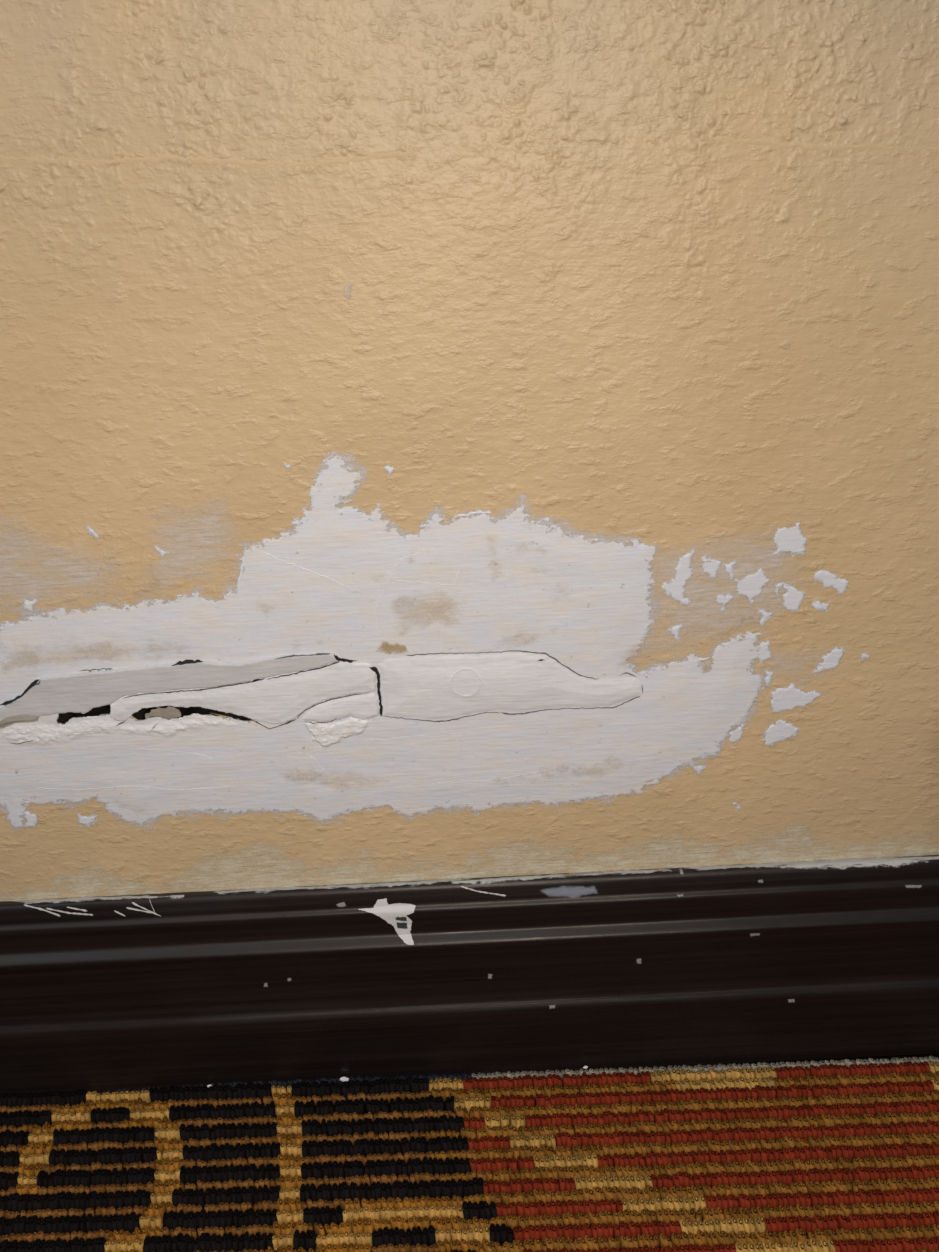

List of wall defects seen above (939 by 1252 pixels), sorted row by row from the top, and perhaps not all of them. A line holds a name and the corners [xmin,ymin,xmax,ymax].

peeling [771,522,807,557]
peeling [21,598,38,612]
peeling [661,549,849,746]
crack [0,679,40,706]
peeling [0,652,380,749]
crack [116,650,643,730]
peeling [24,811,38,828]
peeling [76,813,97,827]